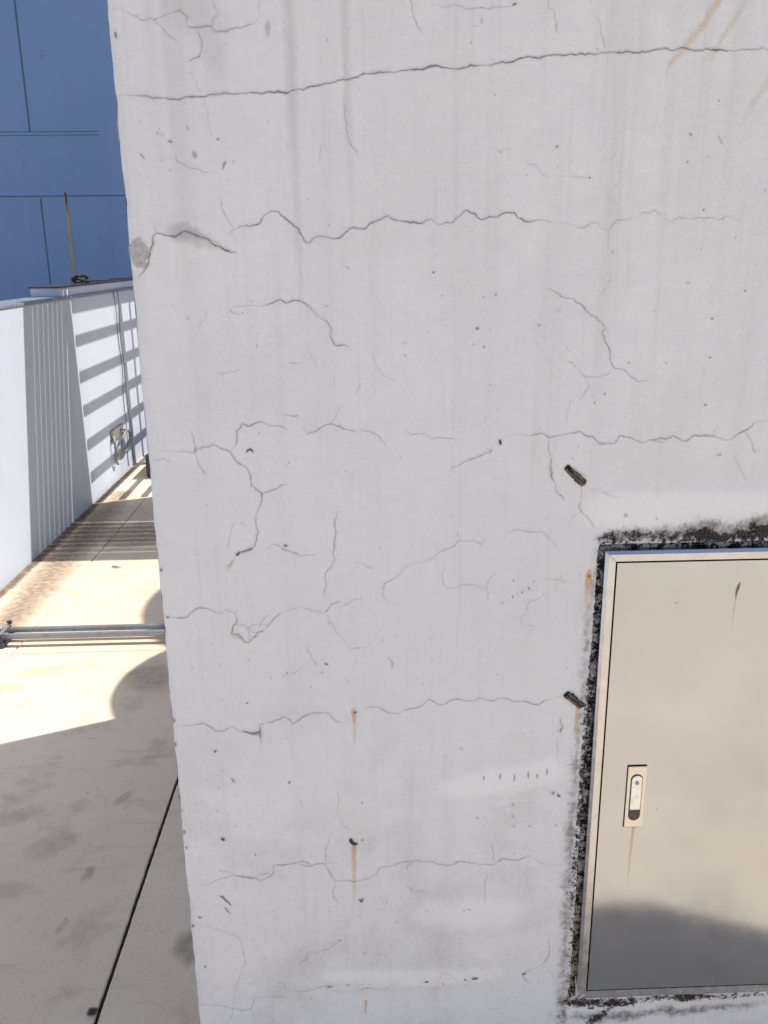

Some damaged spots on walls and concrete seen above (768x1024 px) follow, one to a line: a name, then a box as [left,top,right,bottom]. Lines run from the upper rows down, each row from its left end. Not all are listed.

crack [239,53,596,94]
mould [593,518,768,560]
mould [557,642,765,1024]